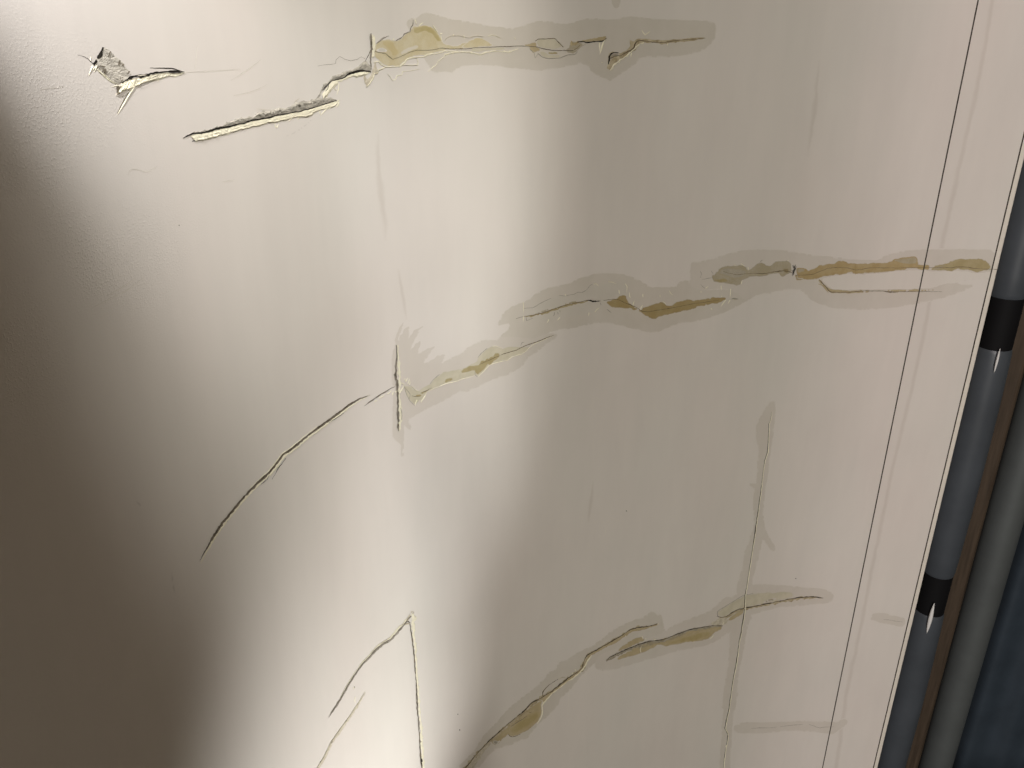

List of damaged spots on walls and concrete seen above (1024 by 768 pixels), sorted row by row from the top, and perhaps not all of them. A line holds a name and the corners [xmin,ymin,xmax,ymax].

spalling [83,47,184,114]
crack [183,31,704,142]
crack [200,395,370,562]
crack [463,412,821,768]
crack [317,611,425,768]